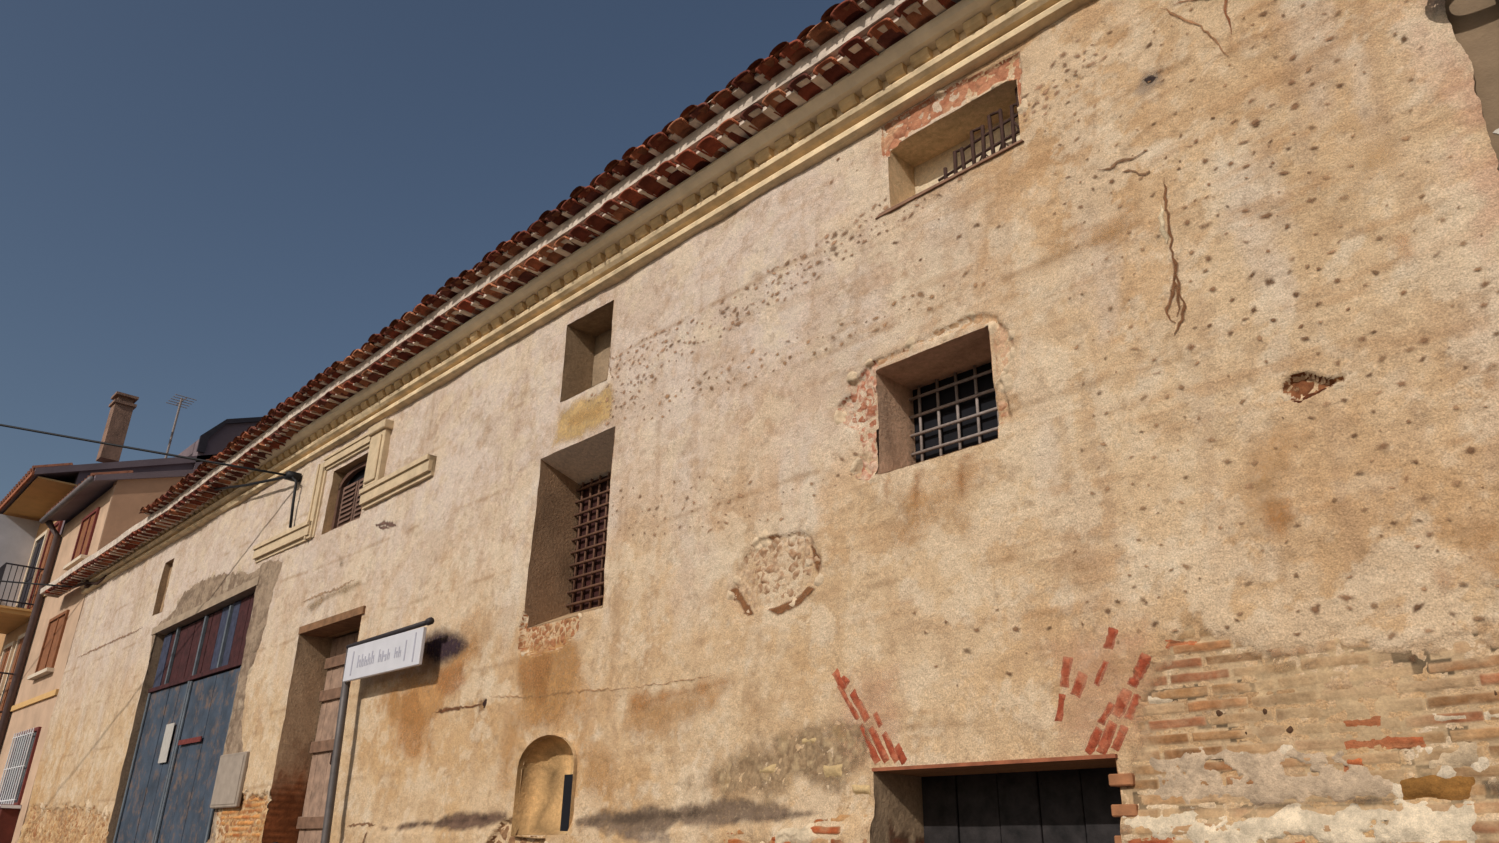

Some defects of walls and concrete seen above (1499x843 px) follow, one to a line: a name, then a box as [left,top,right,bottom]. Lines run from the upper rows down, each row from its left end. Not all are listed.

crack [1160,0,1232,56]
spalling [1163,99,1314,243]
crack [1097,150,1186,335]
spalling [1250,196,1347,284]
spalling [1280,361,1347,419]
spalling [726,489,824,618]
spalling [518,611,582,657]
spalling [712,668,907,843]
flaking render [1055,600,1499,843]
water stain [399,813,506,830]
spalling [487,818,548,843]
water stain [578,799,787,840]